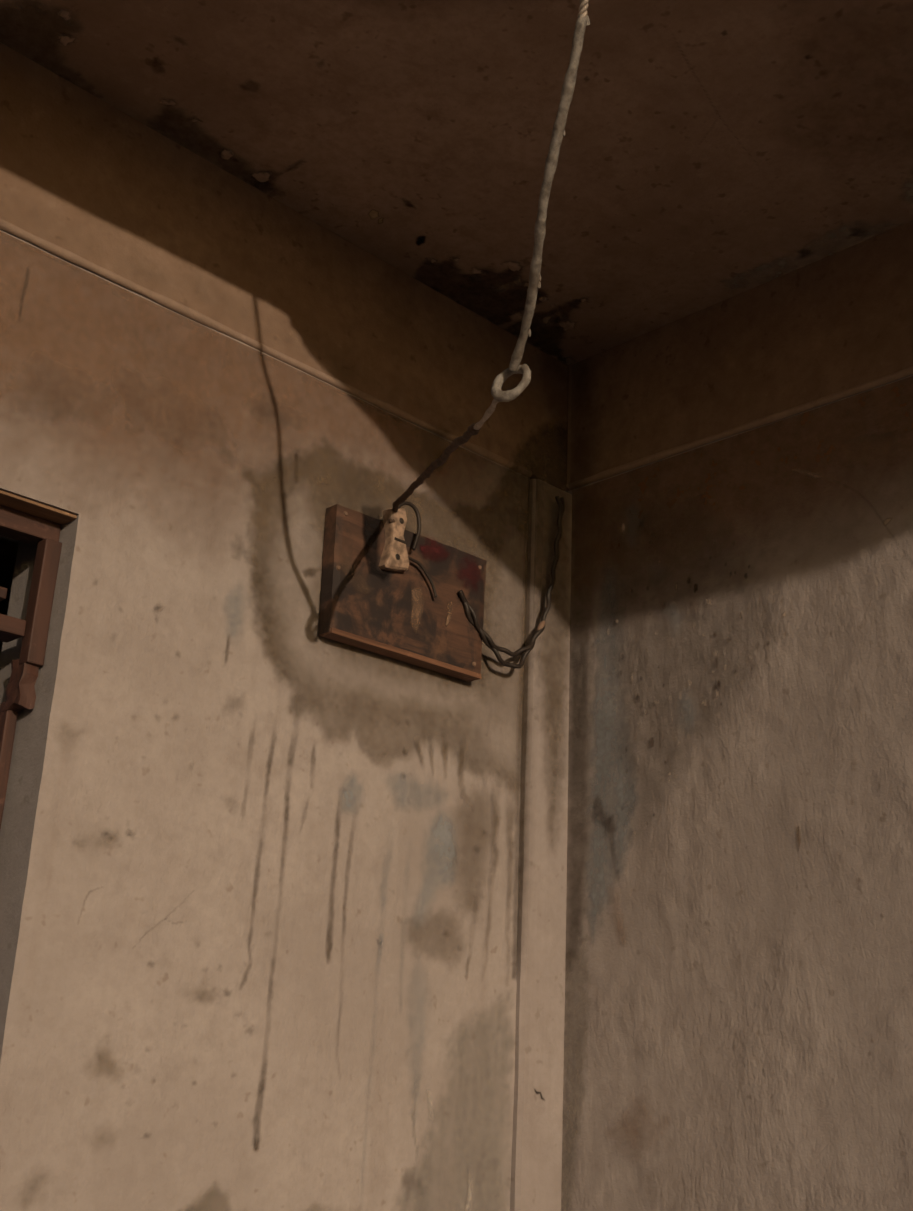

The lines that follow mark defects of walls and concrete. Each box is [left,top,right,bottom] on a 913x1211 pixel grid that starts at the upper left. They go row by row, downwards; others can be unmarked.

spalling [416,258,589,365]
leakage [246,425,595,786]